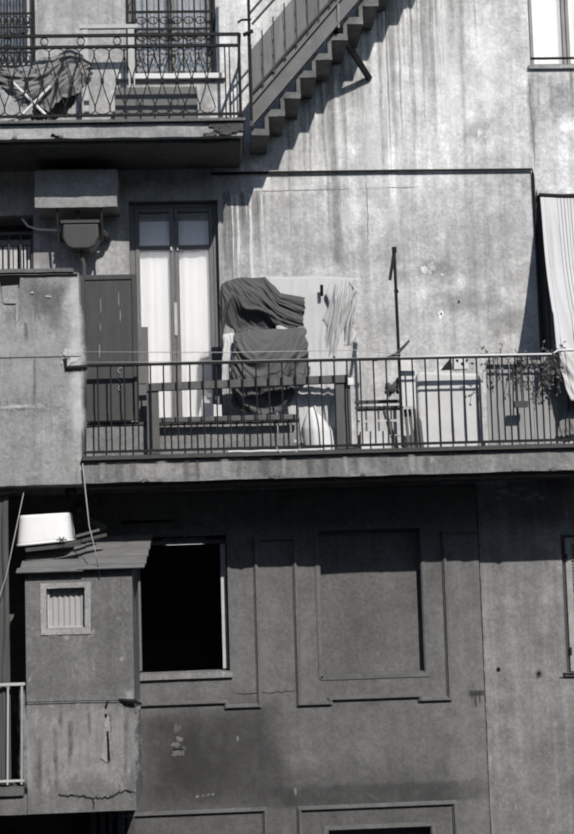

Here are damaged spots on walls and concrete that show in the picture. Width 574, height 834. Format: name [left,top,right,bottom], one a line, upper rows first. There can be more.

water stain [231,195,240,260]
water stain [249,194,264,278]
crack [59,789,136,807]